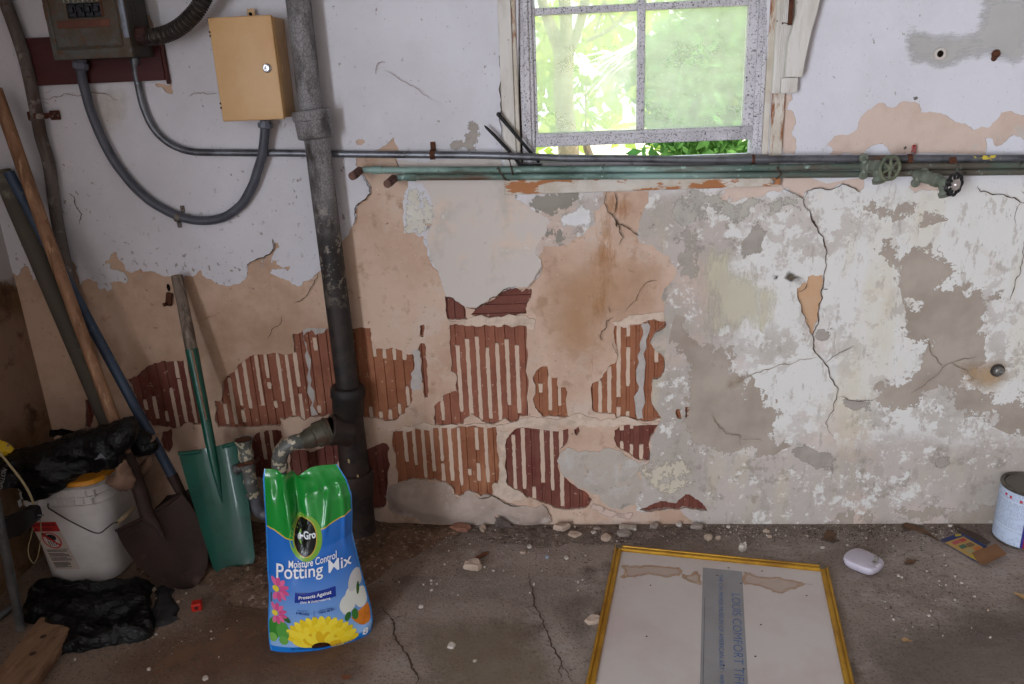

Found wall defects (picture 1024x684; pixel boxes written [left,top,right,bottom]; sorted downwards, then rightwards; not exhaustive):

peeling [827,96,1024,155]
crack [604,192,638,242]
crack [977,186,1022,223]
peeling [13,266,99,440]
peeling [72,238,339,509]
peeling [342,138,950,542]
crack [731,183,875,437]
crack [911,334,976,394]
peeling [895,504,996,527]
crack [527,573,573,684]